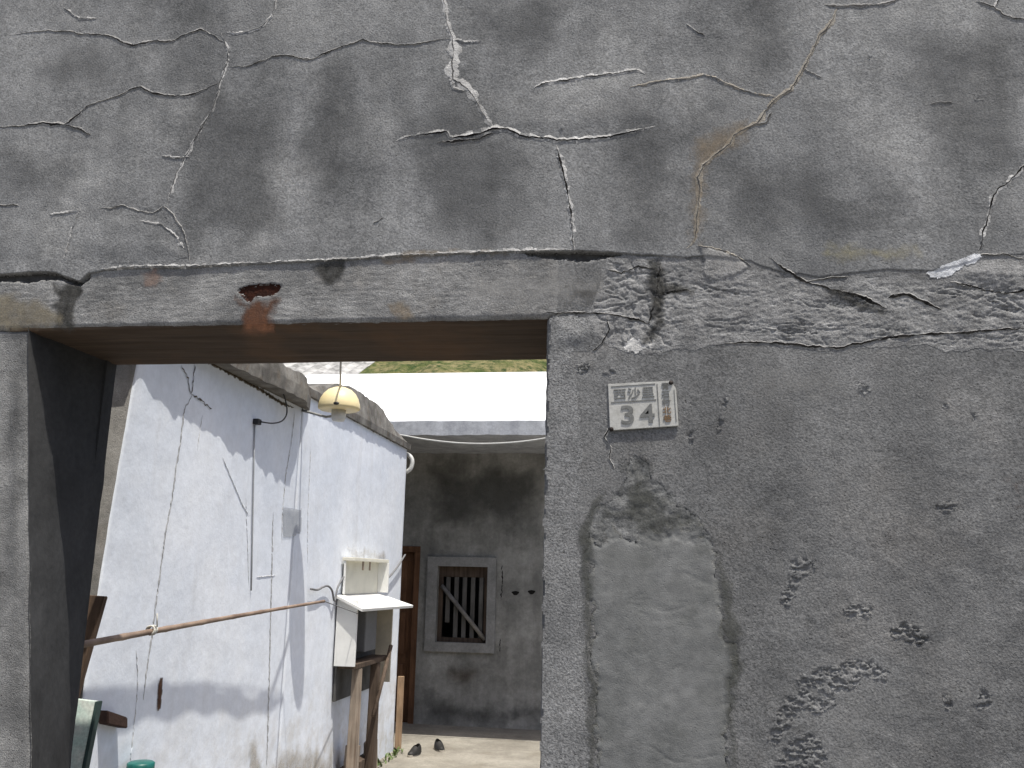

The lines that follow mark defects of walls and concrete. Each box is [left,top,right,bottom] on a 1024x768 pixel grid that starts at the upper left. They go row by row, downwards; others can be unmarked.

crack [0,0,655,271]
crack [534,0,1024,351]
corrosion [239,283,281,332]
water stain [644,261,691,342]
spalling [586,247,1024,355]
crack [130,365,212,761]
spalling [779,557,817,606]
spalling [891,622,929,646]
spalling [767,660,890,768]